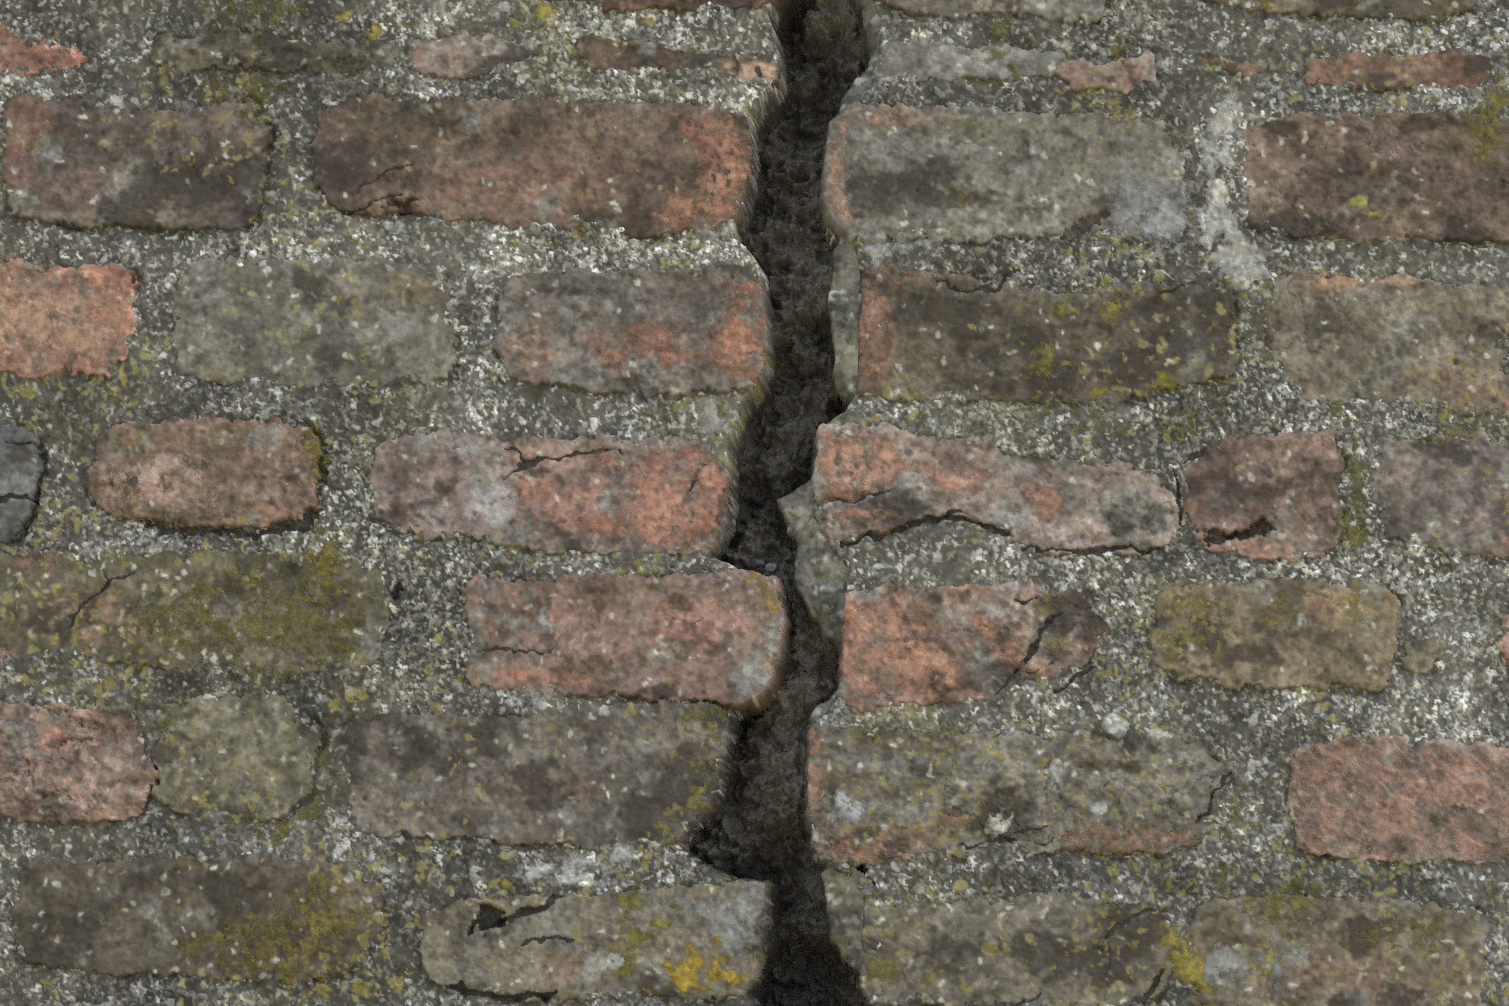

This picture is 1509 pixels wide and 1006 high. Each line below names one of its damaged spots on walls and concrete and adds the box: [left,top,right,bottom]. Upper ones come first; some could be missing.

crack [504,447,622,473]
crack [687,0,1207,1006]
crack [1196,771,1232,822]